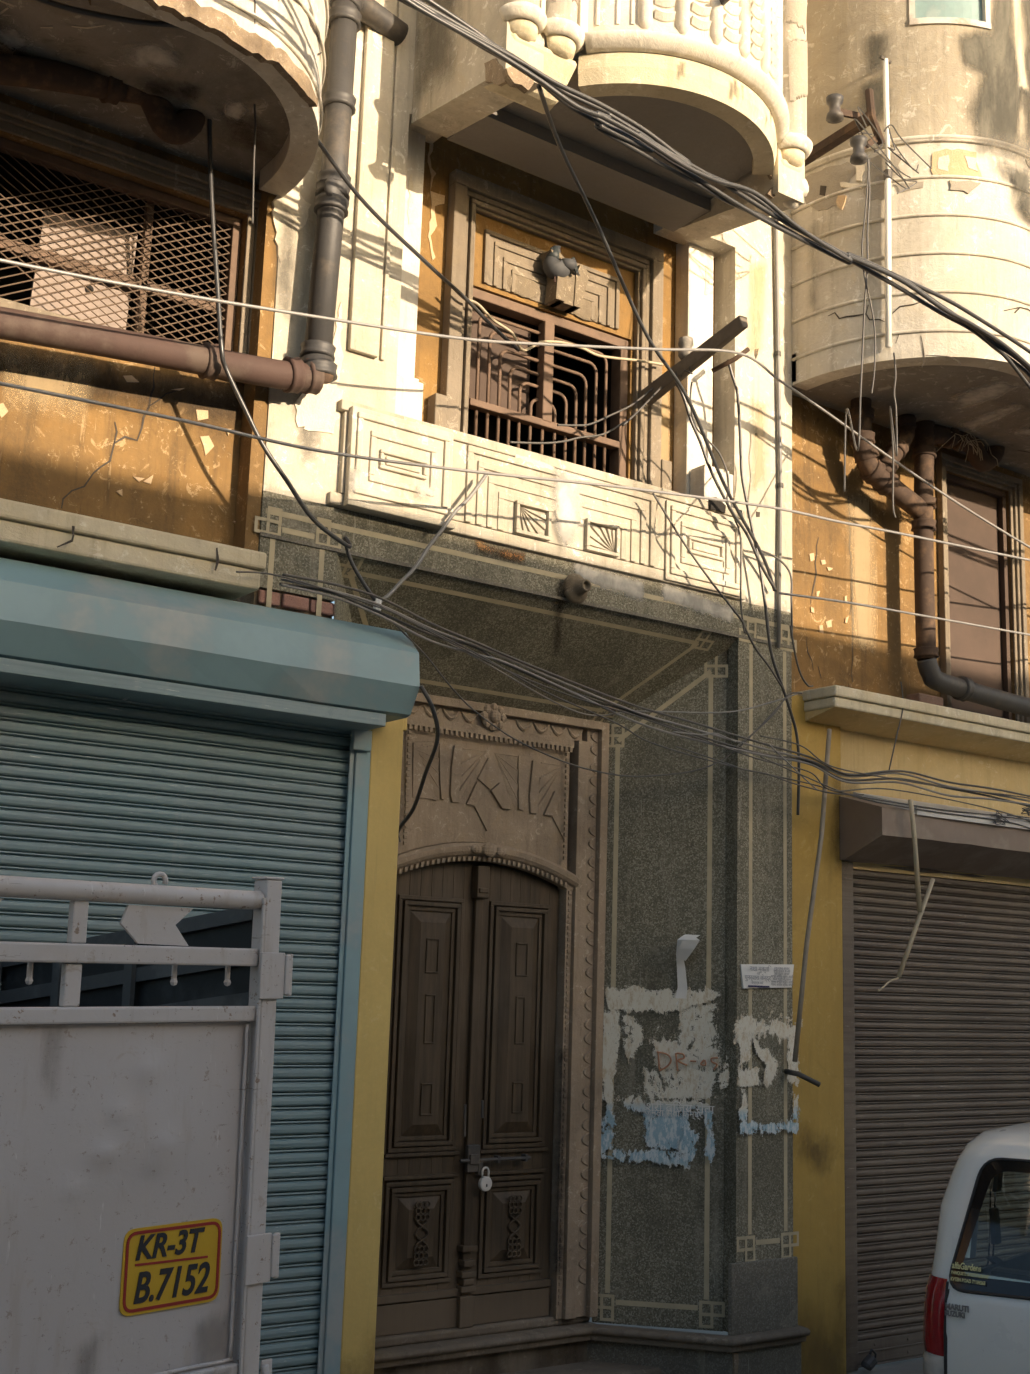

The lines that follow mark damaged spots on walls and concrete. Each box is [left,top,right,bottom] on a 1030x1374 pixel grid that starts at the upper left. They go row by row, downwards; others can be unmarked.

damp [127,46,178,67]
spalling [144,0,318,107]
damp [961,0,1030,219]
peeling [271,190,311,262]
peeling [294,302,344,434]
crack [57,367,158,548]